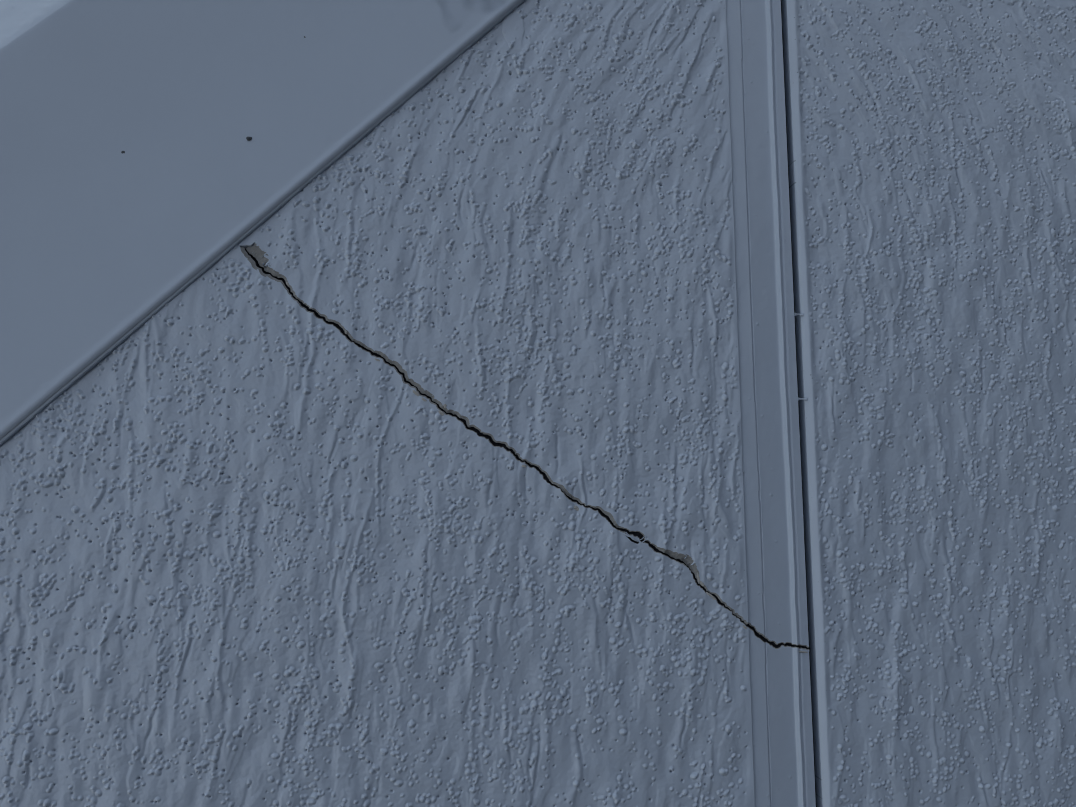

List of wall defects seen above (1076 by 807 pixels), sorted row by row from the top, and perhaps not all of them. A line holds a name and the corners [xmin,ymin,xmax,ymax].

crack [239,242,809,653]